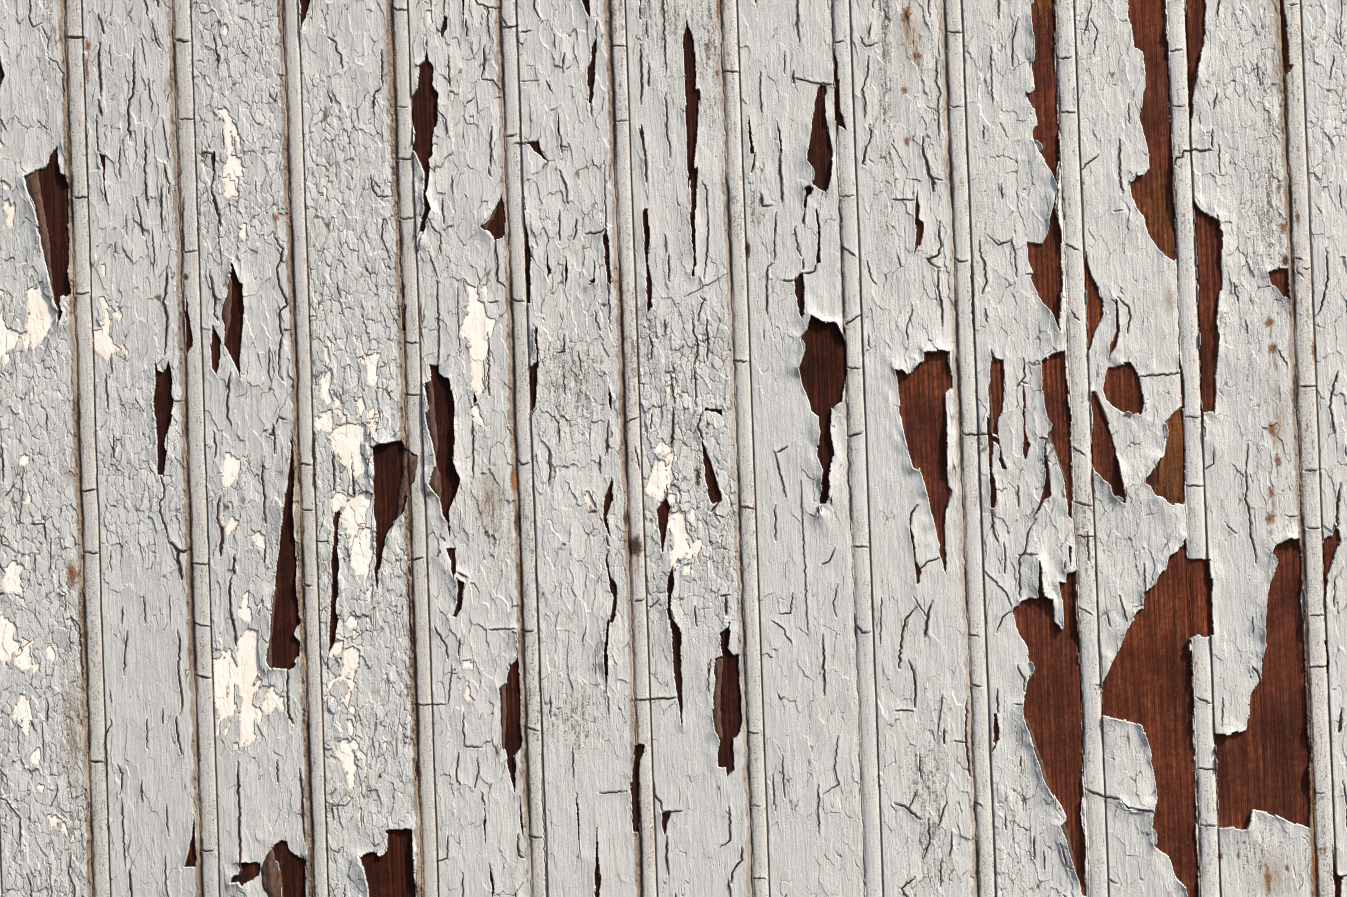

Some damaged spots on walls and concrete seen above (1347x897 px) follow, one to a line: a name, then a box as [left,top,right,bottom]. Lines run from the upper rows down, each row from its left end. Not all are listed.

crack [28,0,224,355]
crack [590,0,671,183]
crack [725,0,878,165]
crack [751,153,876,314]
peeling [1128,0,1176,261]
peeling [373,365,464,617]
peeling [895,350,952,573]
crack [91,417,355,897]
crack [711,447,1071,897]
peeling [1012,546,1086,896]
peeling [1101,540,1213,897]
peeling [1214,538,1310,830]